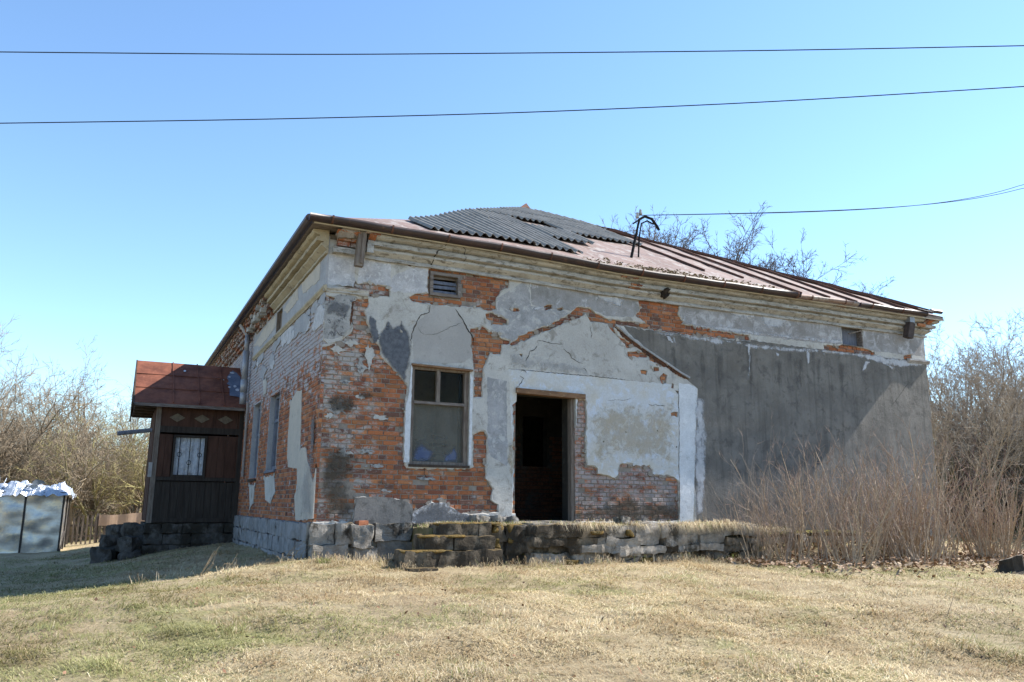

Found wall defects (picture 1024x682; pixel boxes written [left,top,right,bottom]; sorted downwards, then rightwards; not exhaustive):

peeling [253,263,335,397]
crack [410,307,474,346]
flaking render [409,268,749,397]
peeling [248,472,275,510]
water stain [310,416,357,515]
water stain [331,393,372,412]
flaking render [287,280,498,523]
flaking render [574,400,679,522]